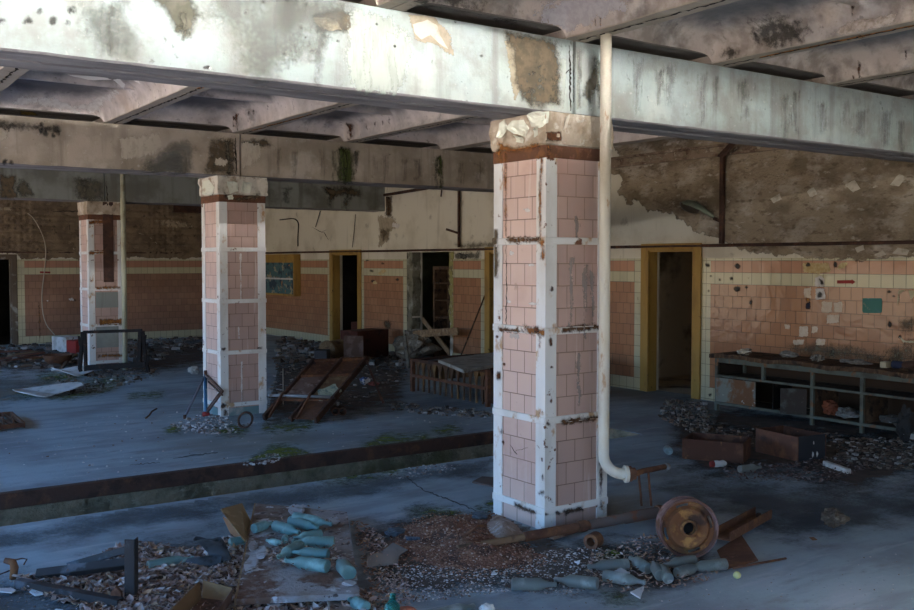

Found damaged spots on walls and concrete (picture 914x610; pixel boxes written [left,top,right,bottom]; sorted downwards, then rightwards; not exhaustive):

leakage [154,0,199,40]
peeling [408,14,454,55]
leakage [753,18,808,47]
leakage [494,0,628,110]
peeling [496,111,549,143]
leakage [205,139,236,175]
rust [497,131,562,260]
flaking render [126,204,202,259]
flaking render [611,138,914,309]
rust [496,326,552,347]
rust [562,324,599,333]
rust [561,416,598,425]